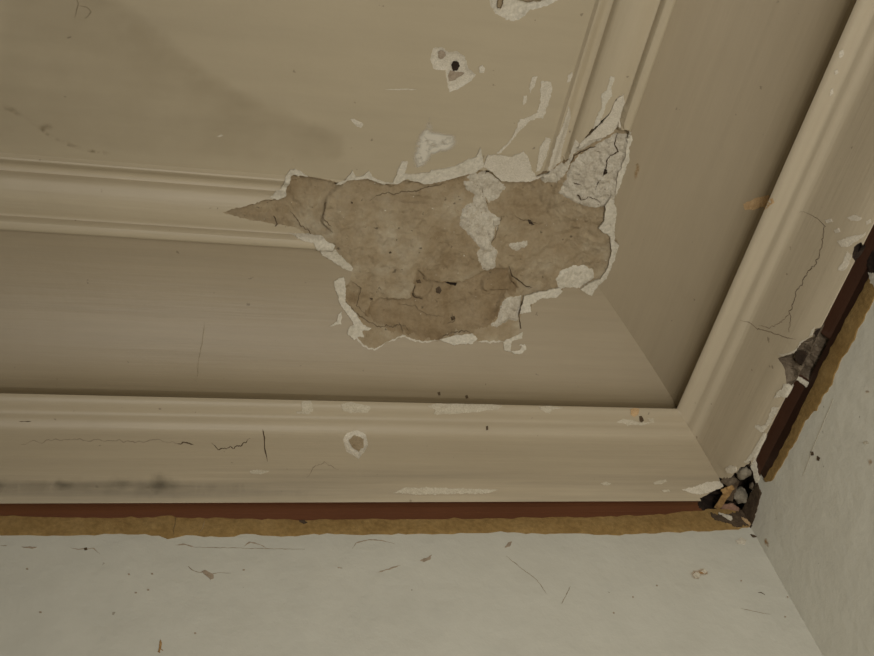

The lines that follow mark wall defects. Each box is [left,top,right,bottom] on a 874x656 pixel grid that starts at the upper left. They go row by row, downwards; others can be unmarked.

flaking render [430,47,485,92]
flaking render [490,0,557,21]
flaking render [223,76,633,354]
crack [744,212,826,339]
crack [19,421,268,462]
peeling [0,215,874,546]